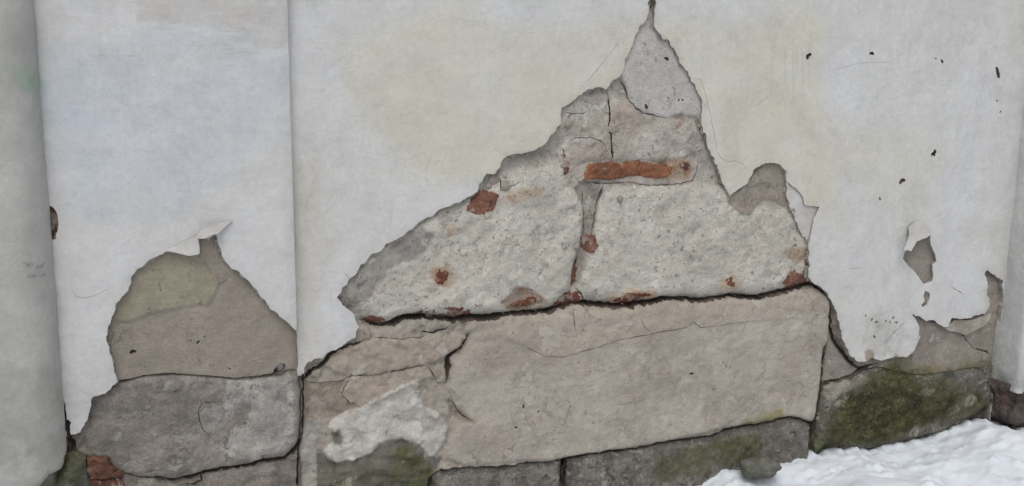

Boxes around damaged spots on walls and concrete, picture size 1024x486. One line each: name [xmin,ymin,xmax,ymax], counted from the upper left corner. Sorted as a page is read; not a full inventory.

flaking render [337,0,818,324]
crack [111,259,873,486]
flaking render [72,219,999,486]